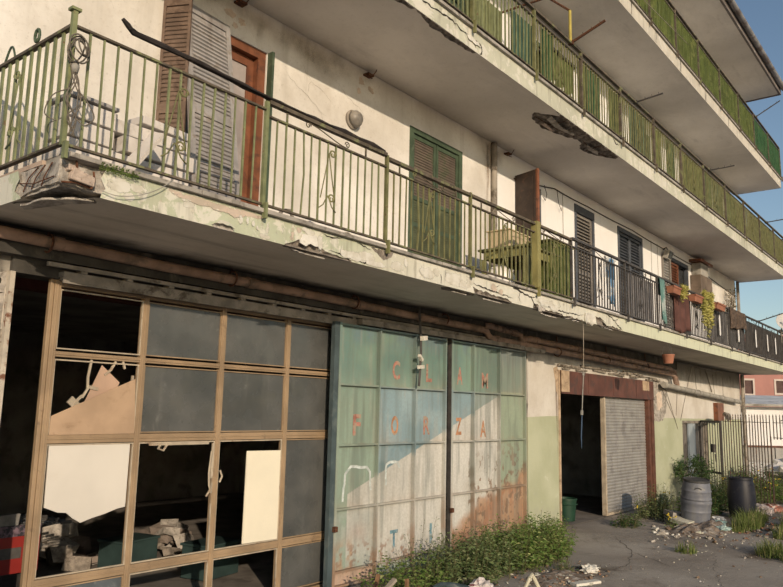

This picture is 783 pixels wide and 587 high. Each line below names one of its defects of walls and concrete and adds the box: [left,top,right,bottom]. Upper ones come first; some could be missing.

crack [422,0,482,55]
spalling [532,112,618,159]
spalling [13,158,147,210]
peeling [169,189,270,240]
spalling [282,226,408,271]
peeling [420,267,512,304]
spalling [532,298,621,331]